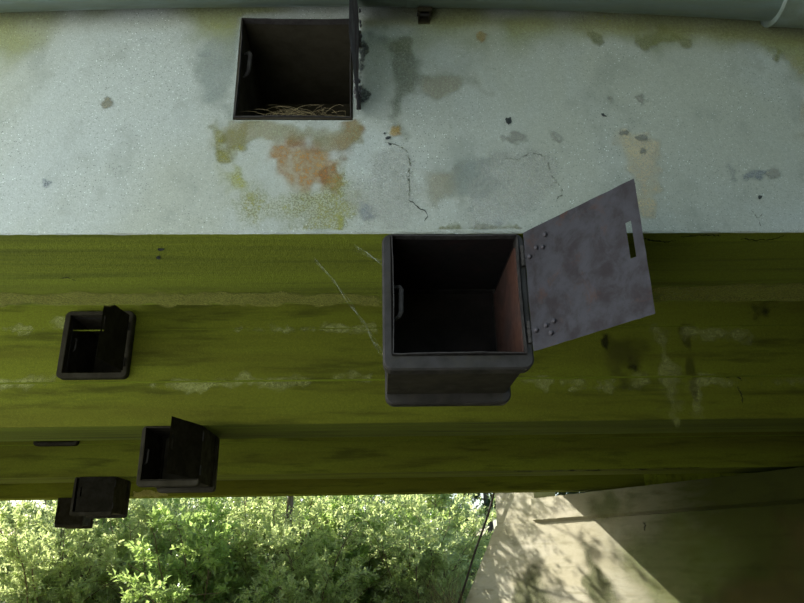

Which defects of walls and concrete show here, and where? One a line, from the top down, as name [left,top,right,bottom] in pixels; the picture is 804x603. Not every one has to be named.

leakage [215,121,296,162]
rust [271,138,343,191]
crack [385,142,428,221]